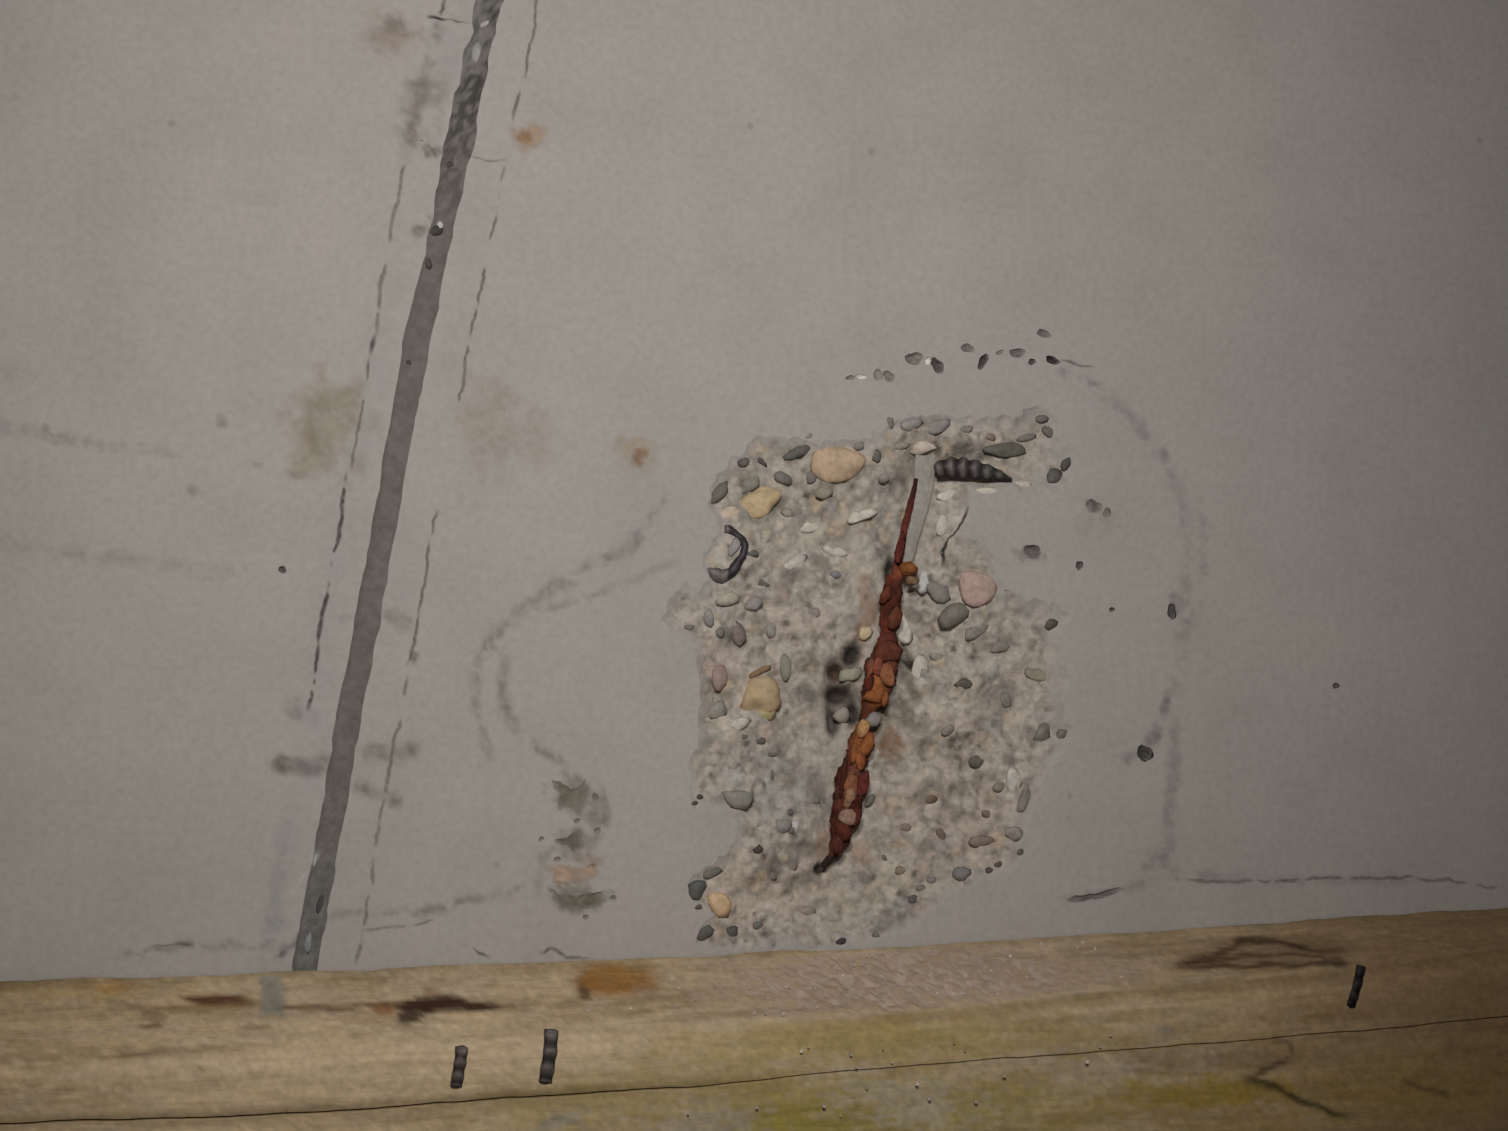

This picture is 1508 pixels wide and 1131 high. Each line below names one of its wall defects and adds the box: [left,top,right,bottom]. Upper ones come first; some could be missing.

crack [514,14,536,109]
crack [458,270,485,399]
crack [334,342,374,551]
crack [309,594,329,702]
crack [412,517,435,647]
spalling [662,406,1077,953]
corrosion [863,530,920,707]
corrosion [821,719,898,855]